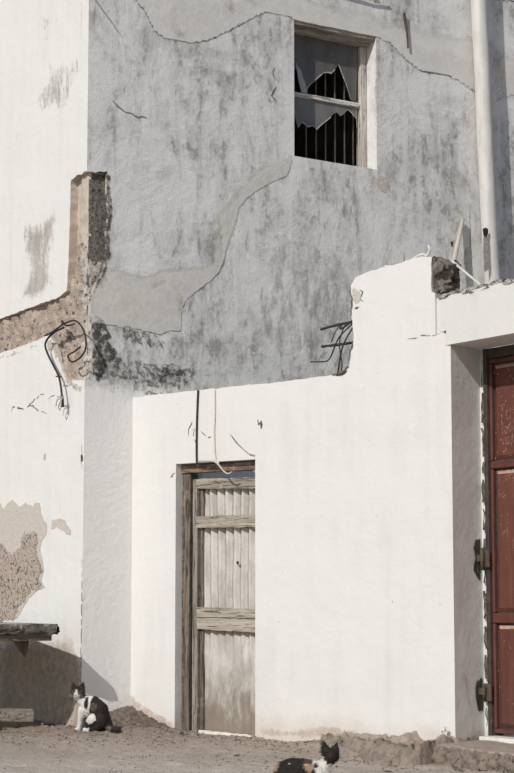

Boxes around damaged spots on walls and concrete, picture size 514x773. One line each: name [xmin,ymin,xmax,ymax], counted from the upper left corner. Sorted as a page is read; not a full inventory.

spalling [0,172,107,391]
damp [91,323,195,395]
peeling [0,500,71,622]